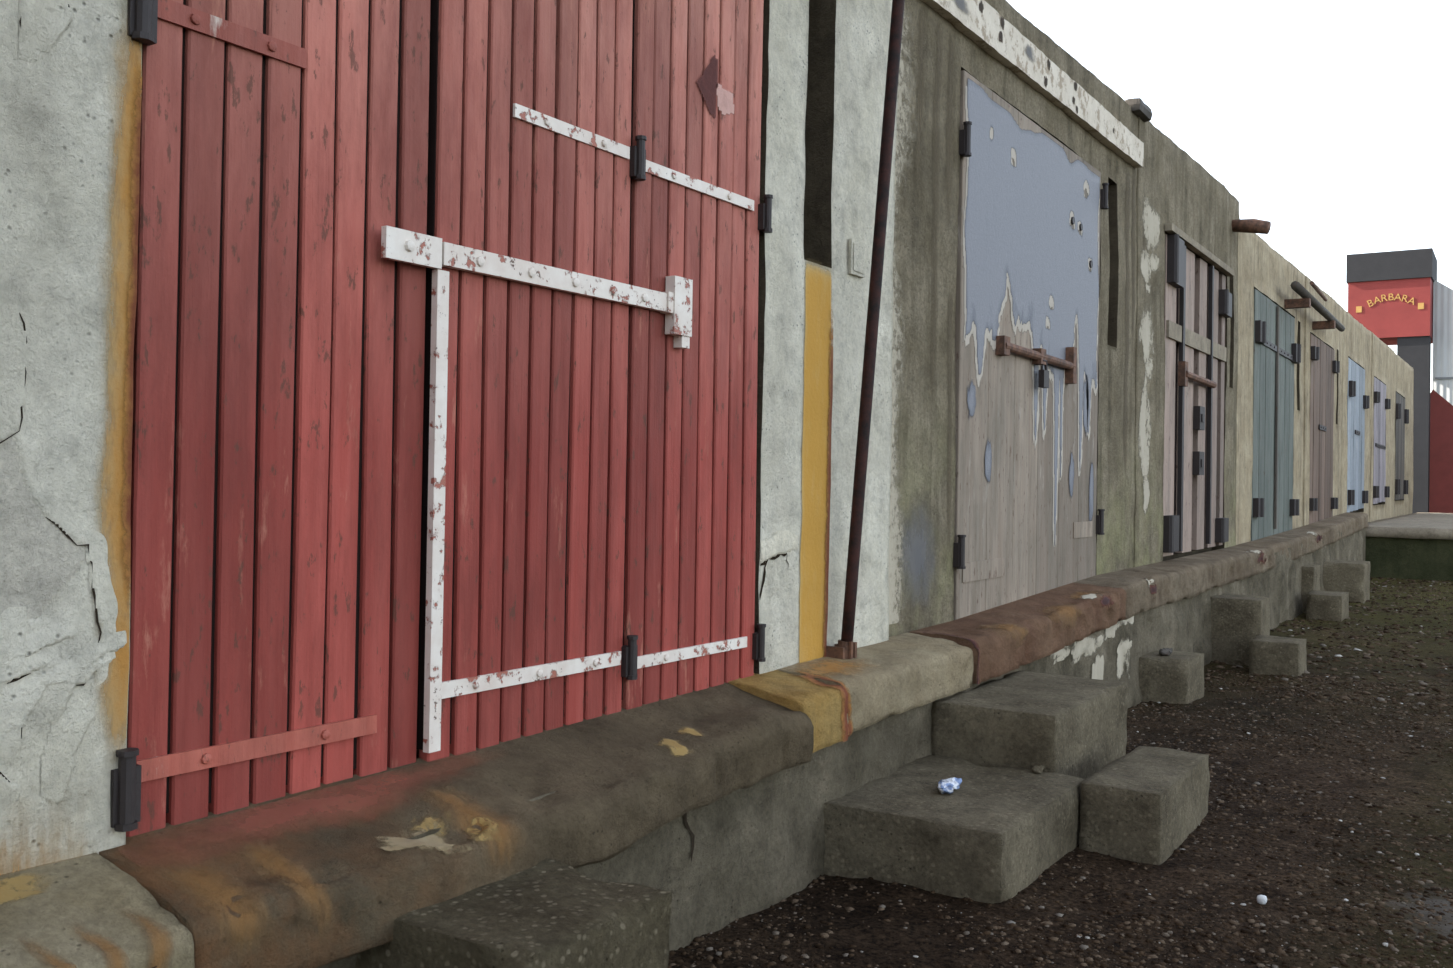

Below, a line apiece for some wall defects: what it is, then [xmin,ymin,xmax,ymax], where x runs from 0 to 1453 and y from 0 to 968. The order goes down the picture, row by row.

peeling [963,78,1100,547]
corrosion [100,39,142,743]
flaking render [0,275,127,810]
spalling [1051,594,1134,680]
peeling [377,817,498,853]
corrosion [0,875,42,905]
corrosion [168,867,266,945]